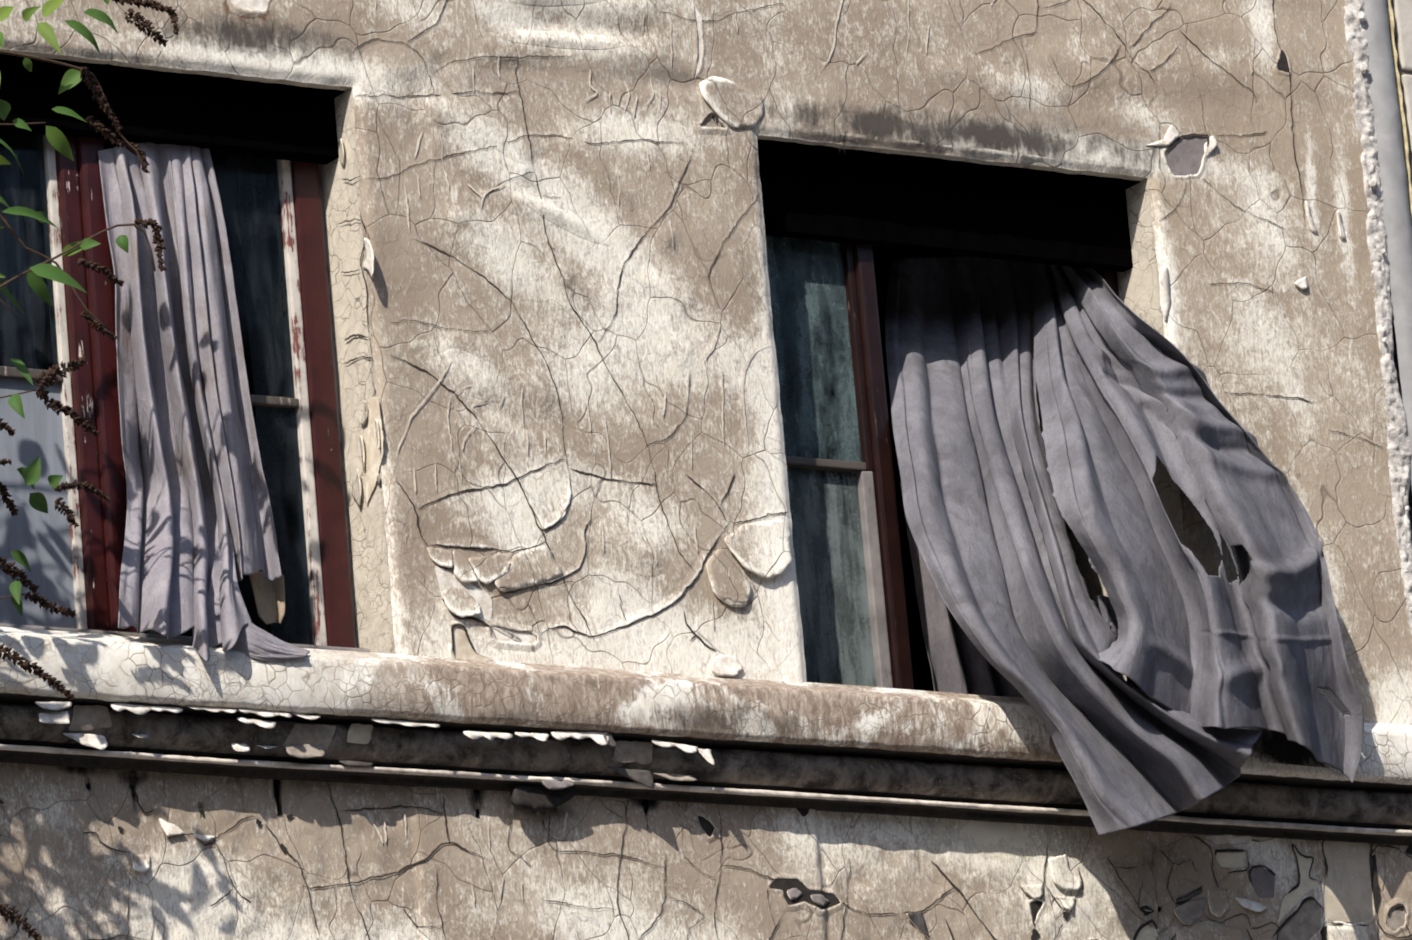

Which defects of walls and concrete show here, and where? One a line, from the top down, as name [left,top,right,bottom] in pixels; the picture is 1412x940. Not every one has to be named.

damp [800,107,824,126]
damp [843,110,1095,159]
crack [975,0,1306,230]
crack [338,0,788,651]
spalling [1344,0,1412,635]
flaking render [35,701,440,767]
peeling [463,731,715,788]
crack [75,772,785,940]
flaking render [766,873,845,917]
crack [838,858,999,940]
crack [1019,834,1279,940]
flaking render [1127,835,1411,940]